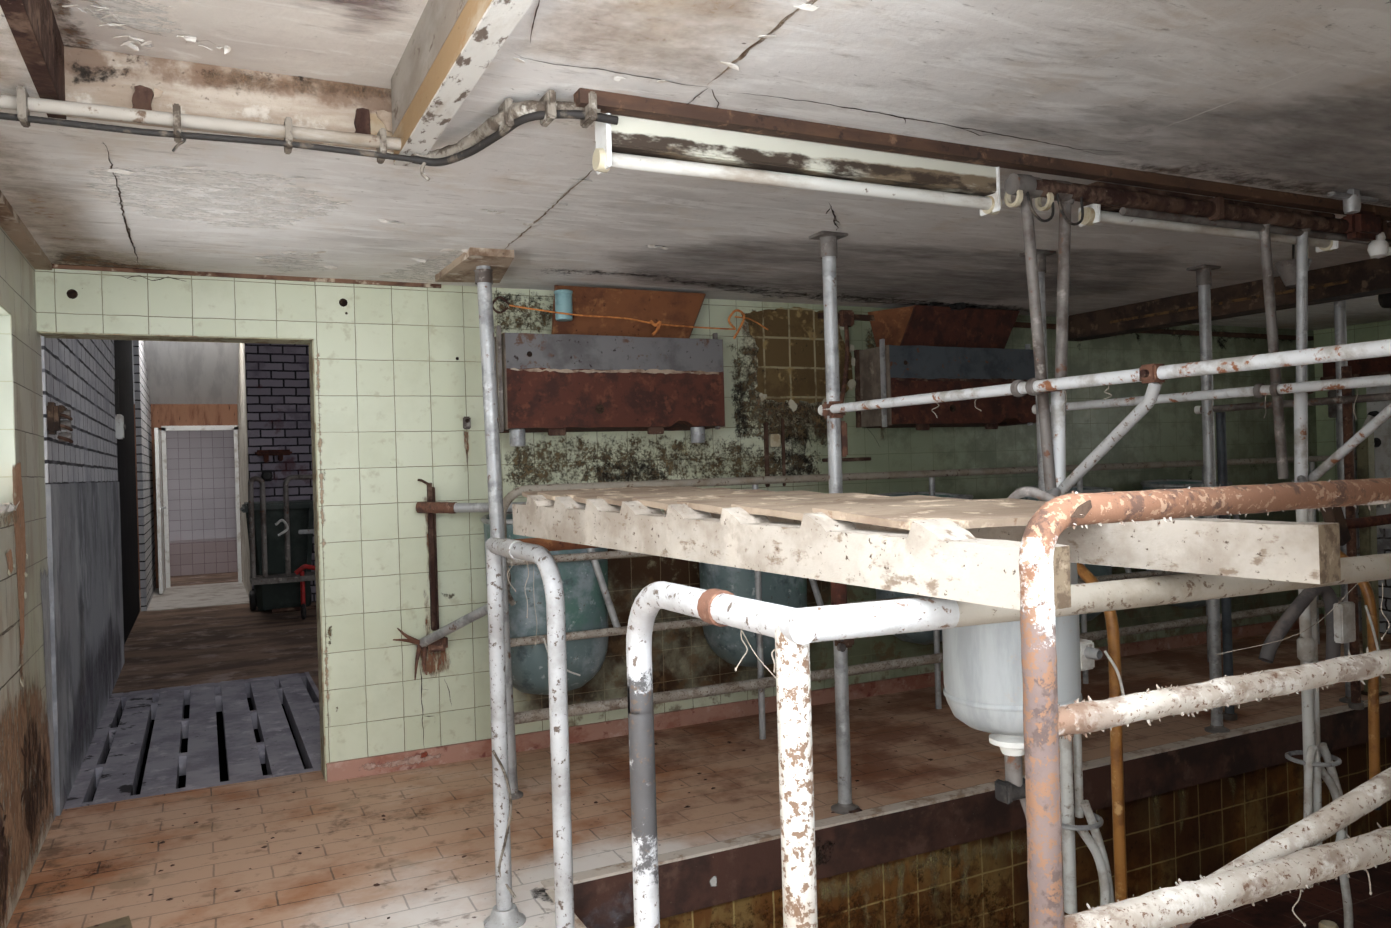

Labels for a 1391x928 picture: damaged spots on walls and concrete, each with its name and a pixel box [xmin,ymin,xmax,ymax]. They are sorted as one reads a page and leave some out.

water stain [326,0,395,20]
crack [513,0,1123,155]
crack [105,145,184,281]
spalling [0,501,20,514]
water stain [0,680,53,927]